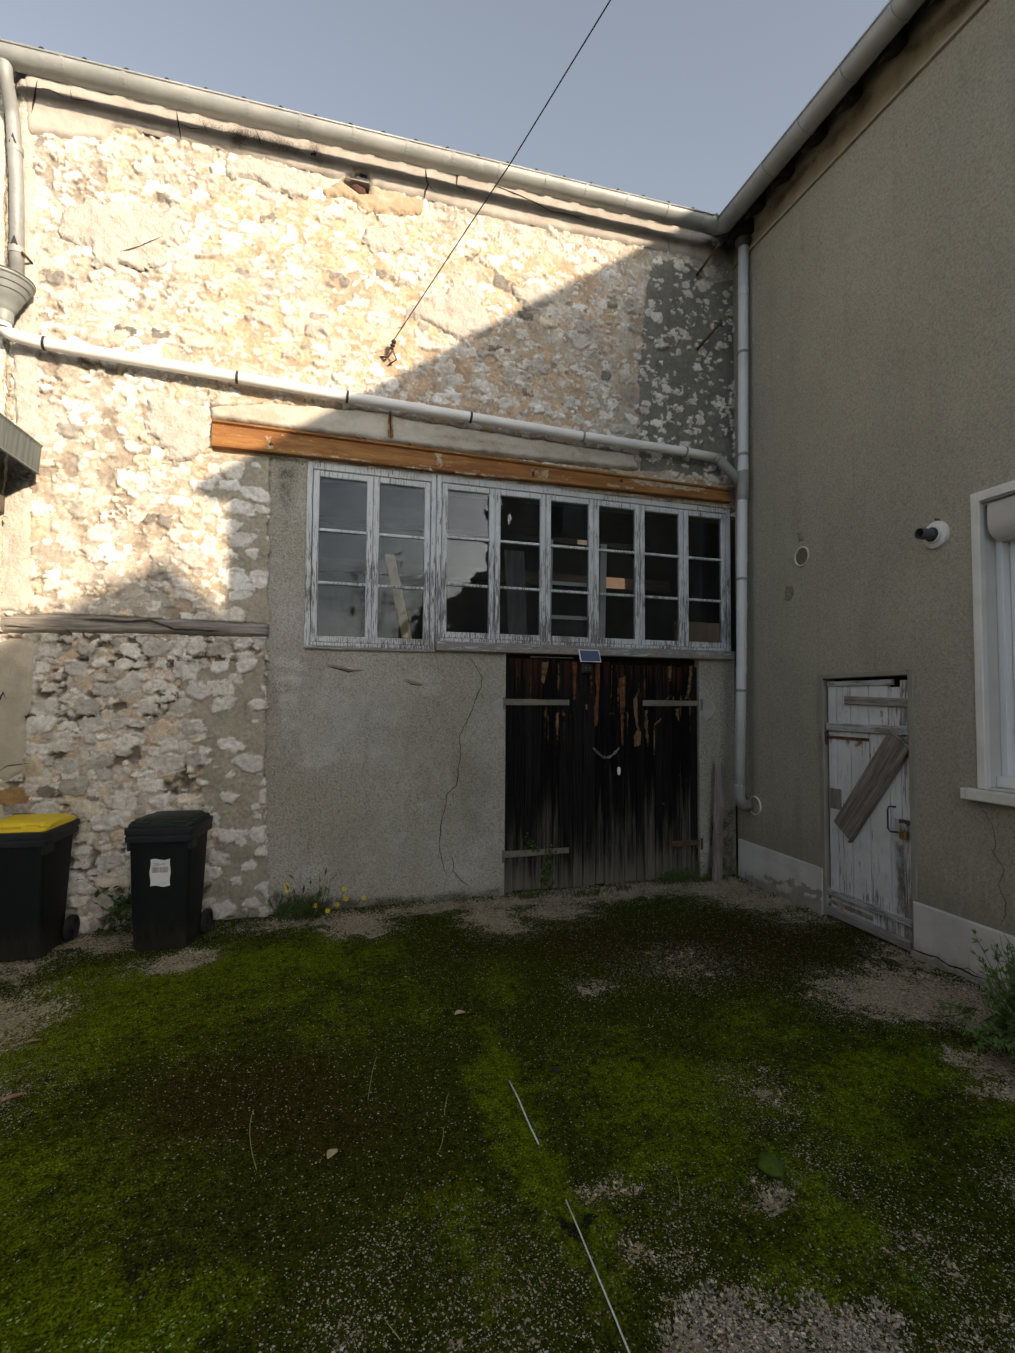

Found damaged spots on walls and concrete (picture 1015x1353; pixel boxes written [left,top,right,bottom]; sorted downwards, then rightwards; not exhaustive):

crack [439,656,484,886]
crack [912,795,1013,979]